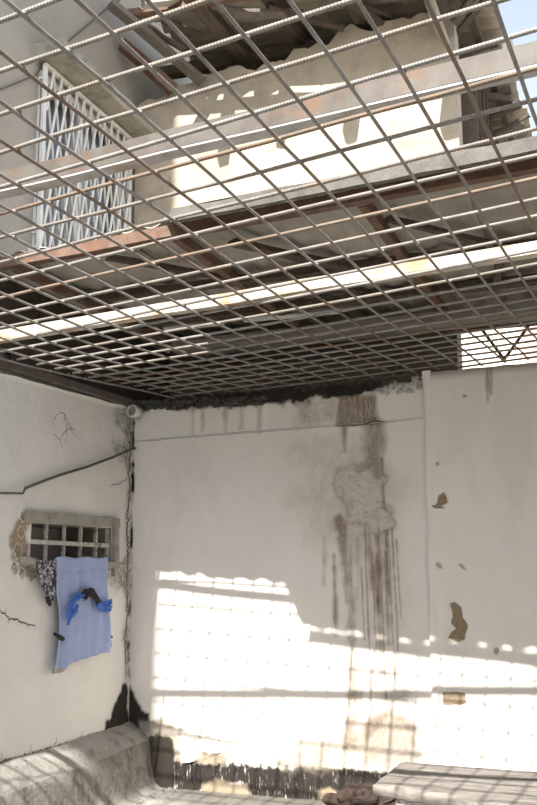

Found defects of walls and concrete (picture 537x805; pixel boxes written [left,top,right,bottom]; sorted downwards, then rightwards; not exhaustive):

crack [52,412,76,447]
spalling [429,491,453,515]
spalling [445,593,477,650]
leakage [105,683,149,730]
spalling [436,685,467,714]
leakage [279,717,418,770]